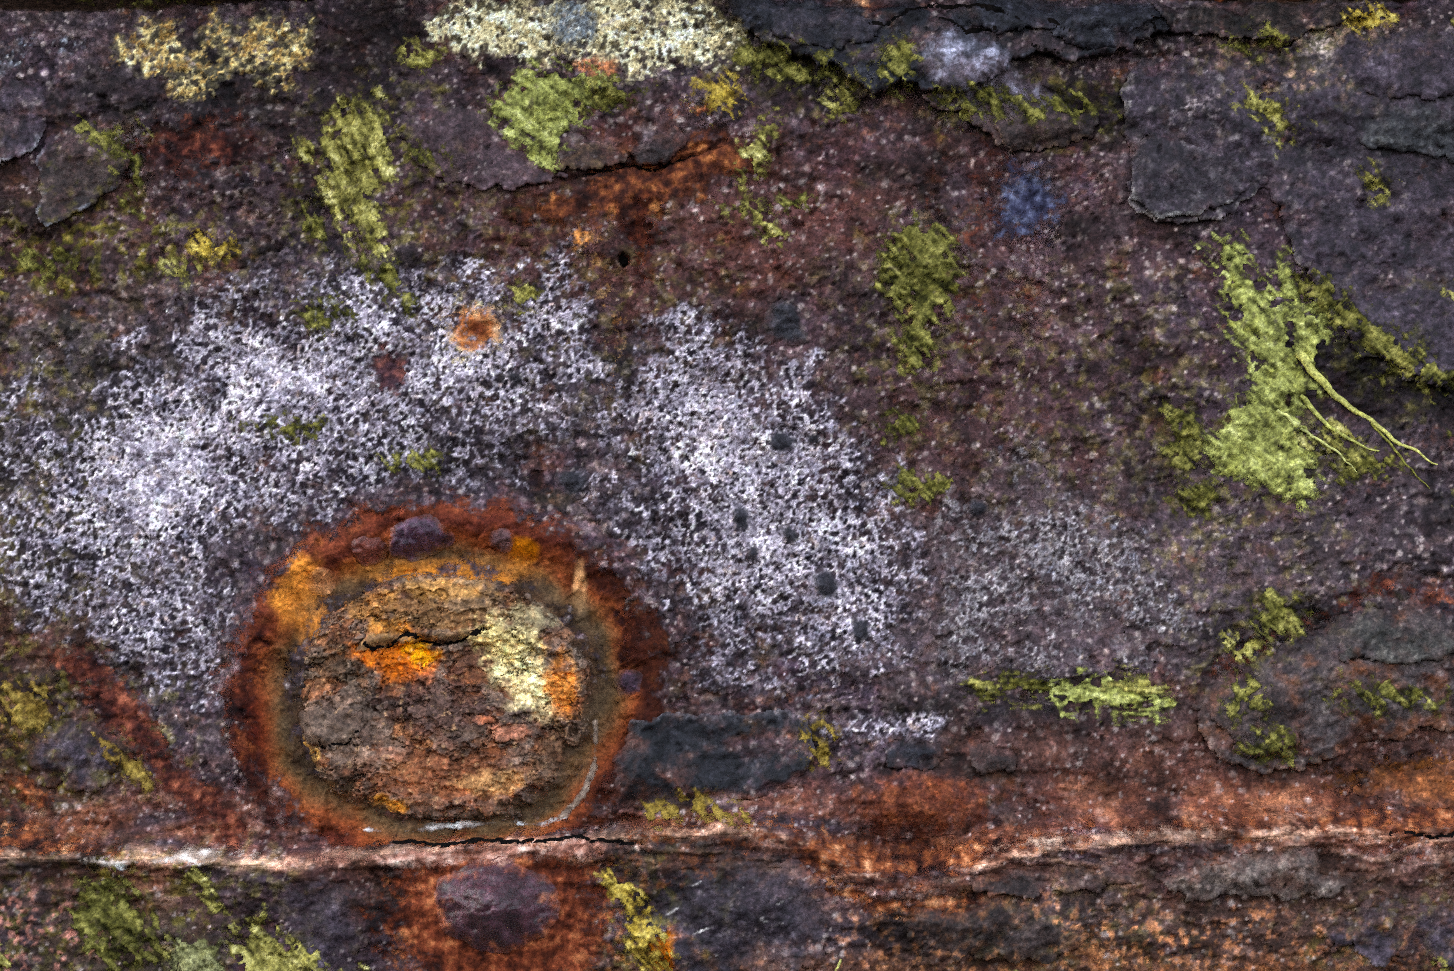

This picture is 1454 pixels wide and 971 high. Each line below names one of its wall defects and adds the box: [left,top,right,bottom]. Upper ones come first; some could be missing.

rust [47,489,703,971]
crack [379,834,636,848]
rust [726,815,1106,918]
rust [1166,770,1454,866]